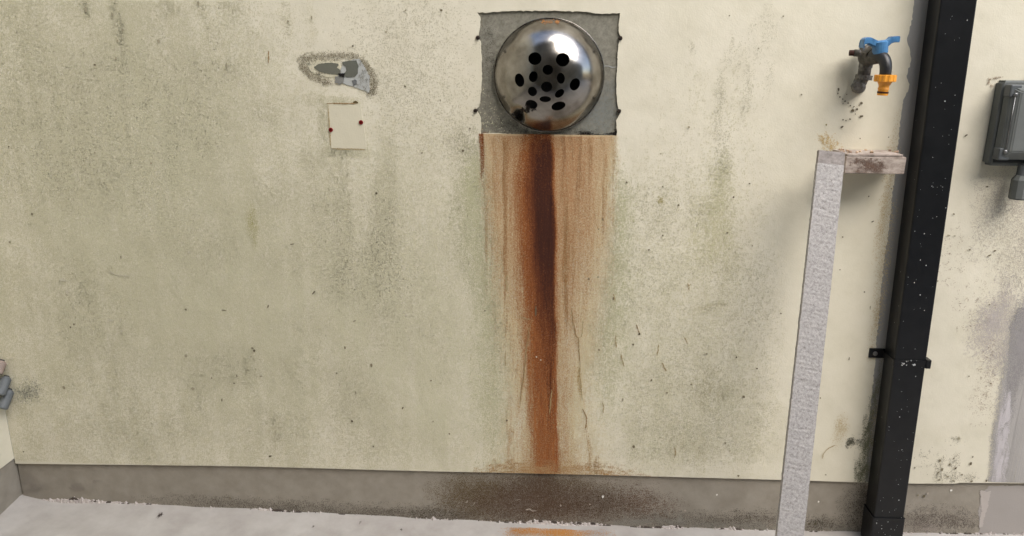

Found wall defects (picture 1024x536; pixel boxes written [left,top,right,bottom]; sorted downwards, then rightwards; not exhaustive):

peeling [296,49,380,103]
rust [422,128,689,536]
damp [854,346,884,482]
damp [961,166,1024,433]